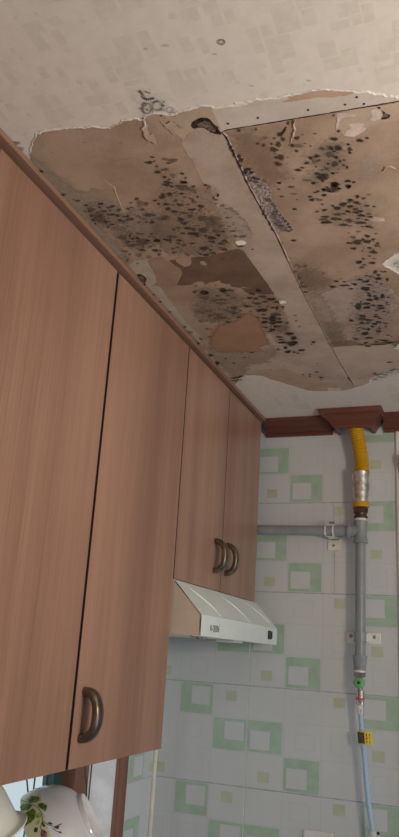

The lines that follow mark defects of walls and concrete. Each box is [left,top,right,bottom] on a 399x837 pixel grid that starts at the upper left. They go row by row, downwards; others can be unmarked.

damp [138,90,164,119]
damp [77,156,315,365]
flaking render [243,168,293,235]
damp [257,130,399,347]